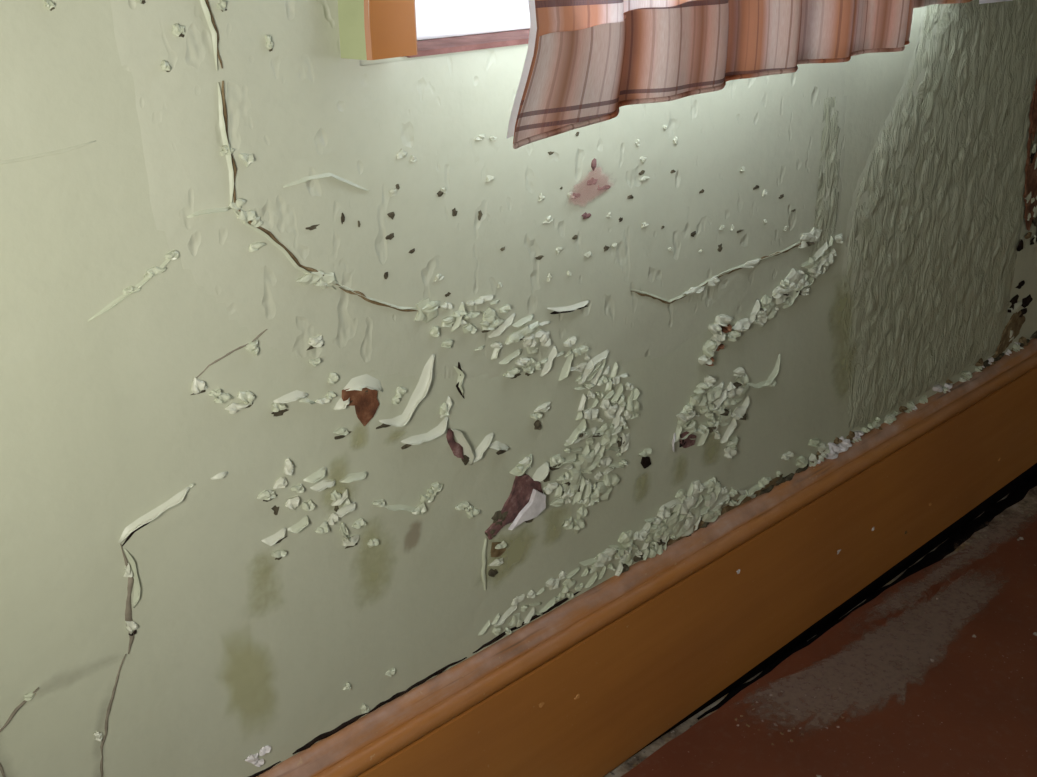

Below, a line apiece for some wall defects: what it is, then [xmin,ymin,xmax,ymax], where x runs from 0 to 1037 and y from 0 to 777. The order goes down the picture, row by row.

crack [94,471,228,777]
peeling [191,329,267,414]
peeling [257,282,652,590]
peeling [672,234,843,460]
spalling [478,331,1037,636]